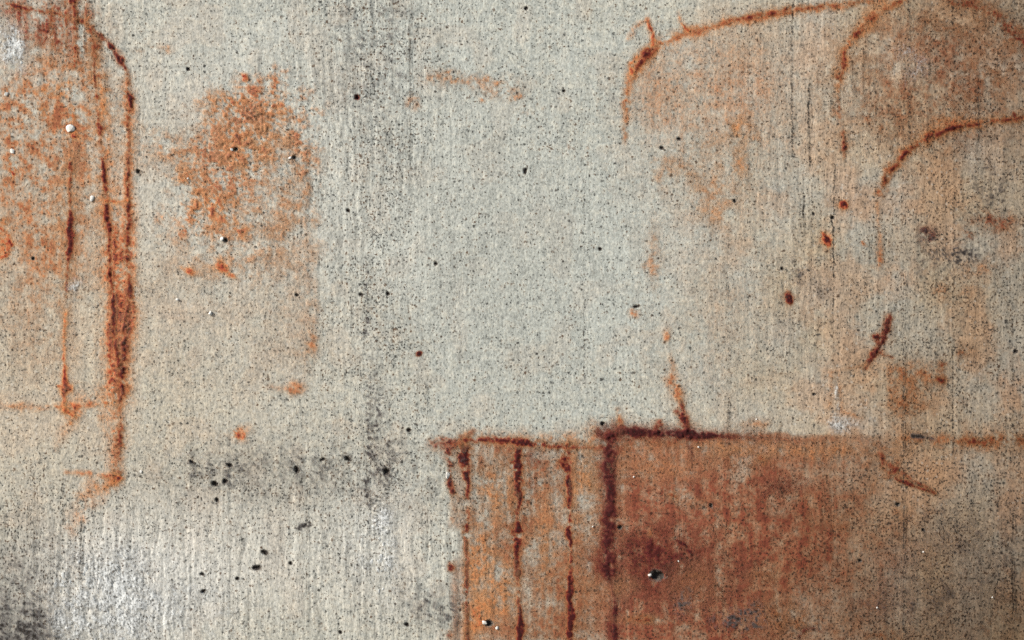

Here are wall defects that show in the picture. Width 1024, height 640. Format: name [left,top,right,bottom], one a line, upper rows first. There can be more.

corrosion [159,73,318,242]
corrosion [623,0,903,136]
corrosion [868,0,1024,221]
corrosion [0,0,138,493]
corrosion [215,257,235,278]
corrosion [821,232,832,248]
corrosion [858,314,947,415]
corrosion [429,374,936,640]
corrosion [899,433,1024,451]